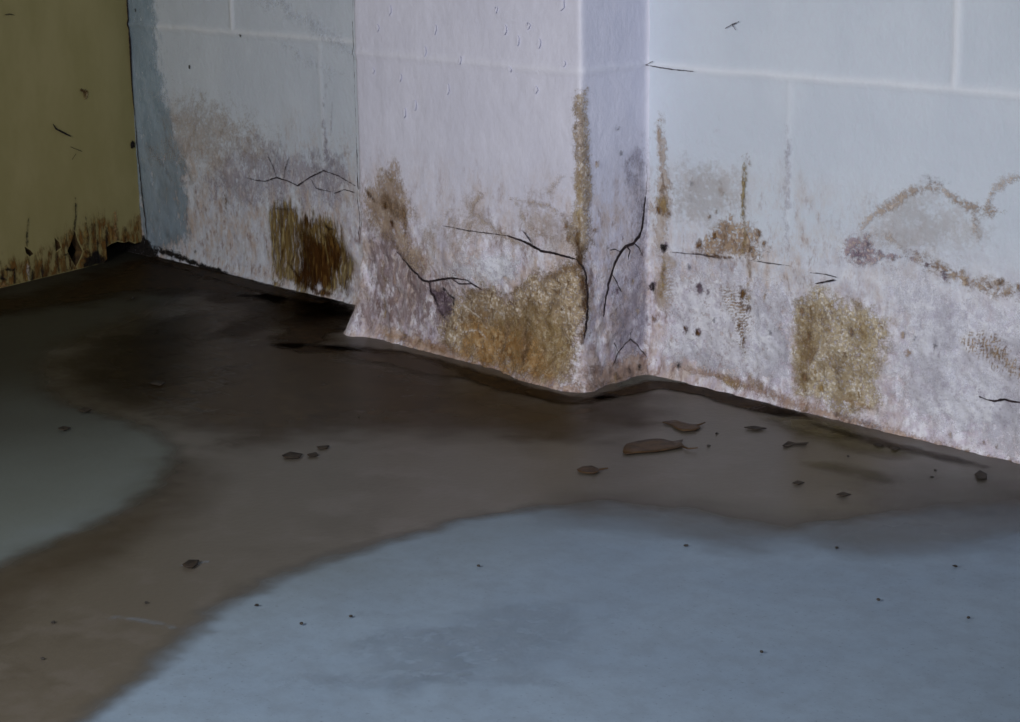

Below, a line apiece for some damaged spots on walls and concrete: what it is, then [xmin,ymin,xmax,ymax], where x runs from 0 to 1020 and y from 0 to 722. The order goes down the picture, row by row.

damp [0,212,119,287]
damp [114,0,325,305]
crack [251,143,360,240]
crack [397,252,481,300]
crack [445,183,647,339]
damp [844,177,1020,297]
damp [0,232,1020,722]